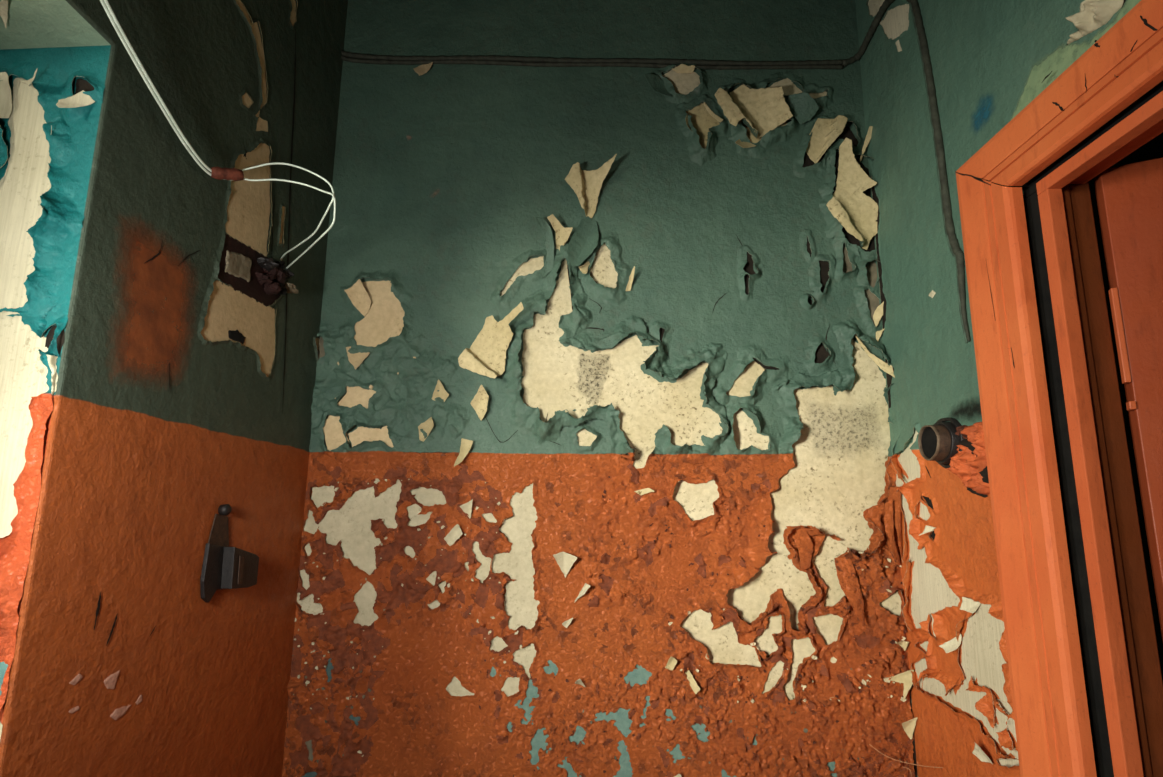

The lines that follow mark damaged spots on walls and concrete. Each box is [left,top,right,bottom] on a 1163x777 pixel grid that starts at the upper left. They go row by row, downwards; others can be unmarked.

peeling [0,0,11,28]
peeling [0,60,105,739]
flaking render [196,0,287,382]
peeling [284,62,1020,777]